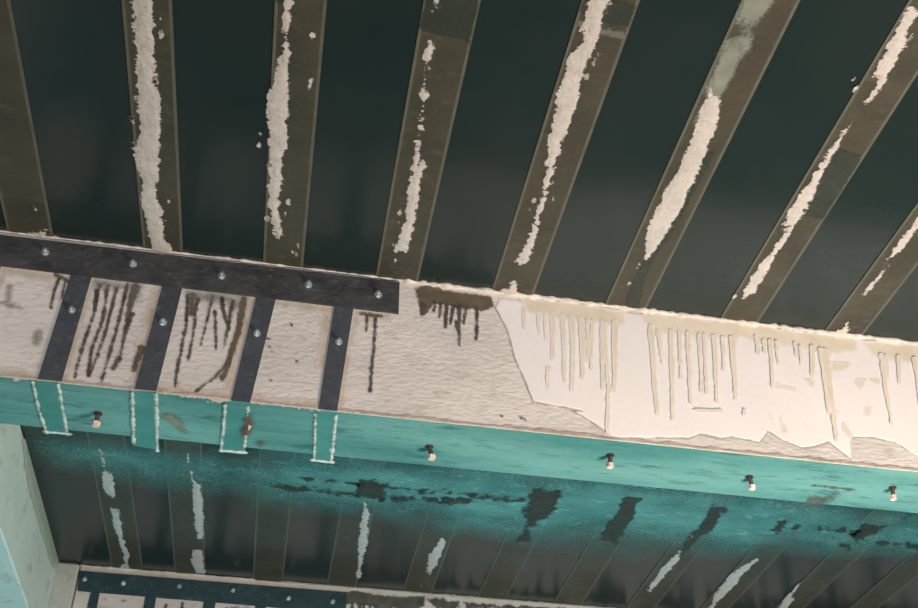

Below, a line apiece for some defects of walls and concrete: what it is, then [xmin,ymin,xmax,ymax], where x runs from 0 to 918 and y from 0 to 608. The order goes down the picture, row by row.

damp [706,0,773,99]
flaking render [514,0,612,265]
damp [50,273,69,309]
damp [74,282,140,381]
spalling [0,374,231,399]
damp [132,345,145,372]
damp [174,293,247,392]
damp [360,312,382,392]
peeling [250,280,918,472]
damp [519,153,918,443]
flaking render [863,217,918,295]
damp [346,591,558,608]